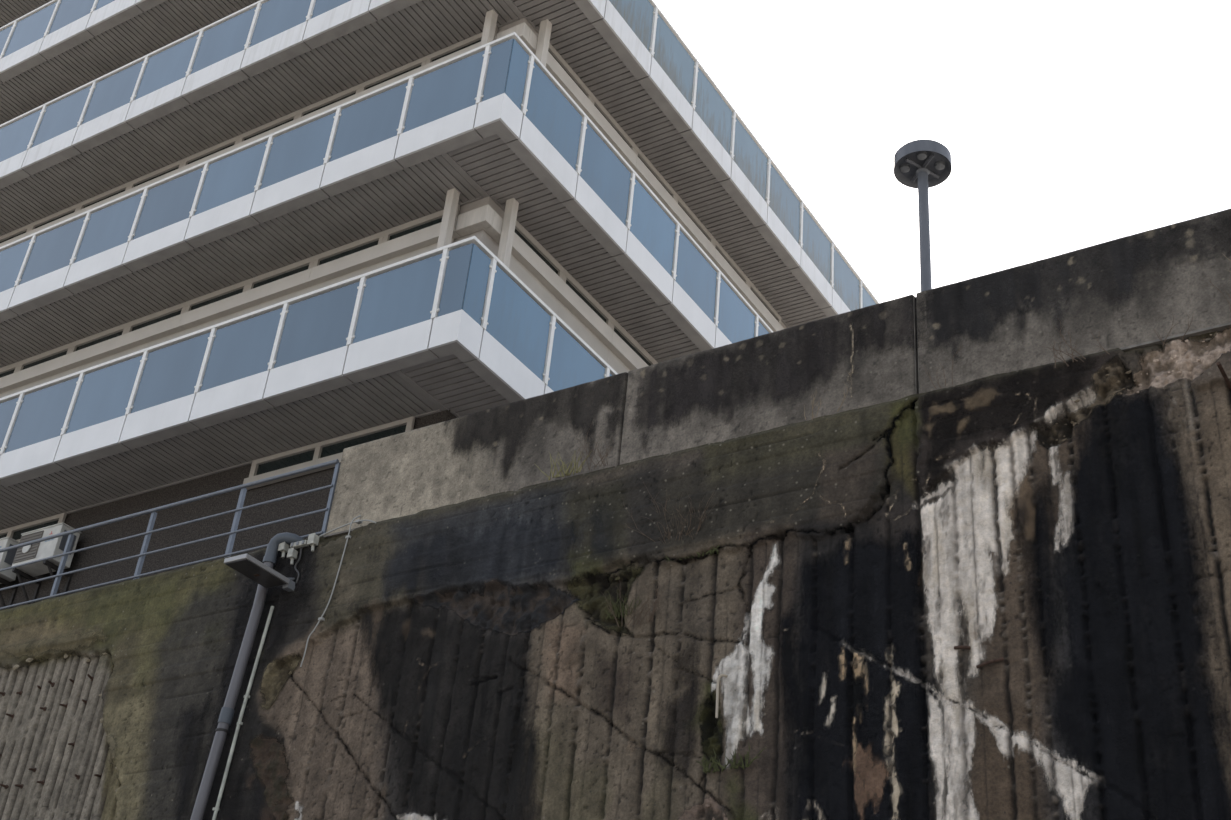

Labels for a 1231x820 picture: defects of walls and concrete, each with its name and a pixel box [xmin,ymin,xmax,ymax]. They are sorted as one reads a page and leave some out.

damp [1086,233,1164,301]
damp [1175,223,1208,256]
damp [445,372,627,478]
damp [639,257,1073,429]
spalling [1036,327,1231,449]
crack [607,399,918,662]
damp [712,357,1231,820]
crack [290,674,452,817]
damp [352,603,538,820]
crack [471,659,730,811]
damp [661,681,697,764]